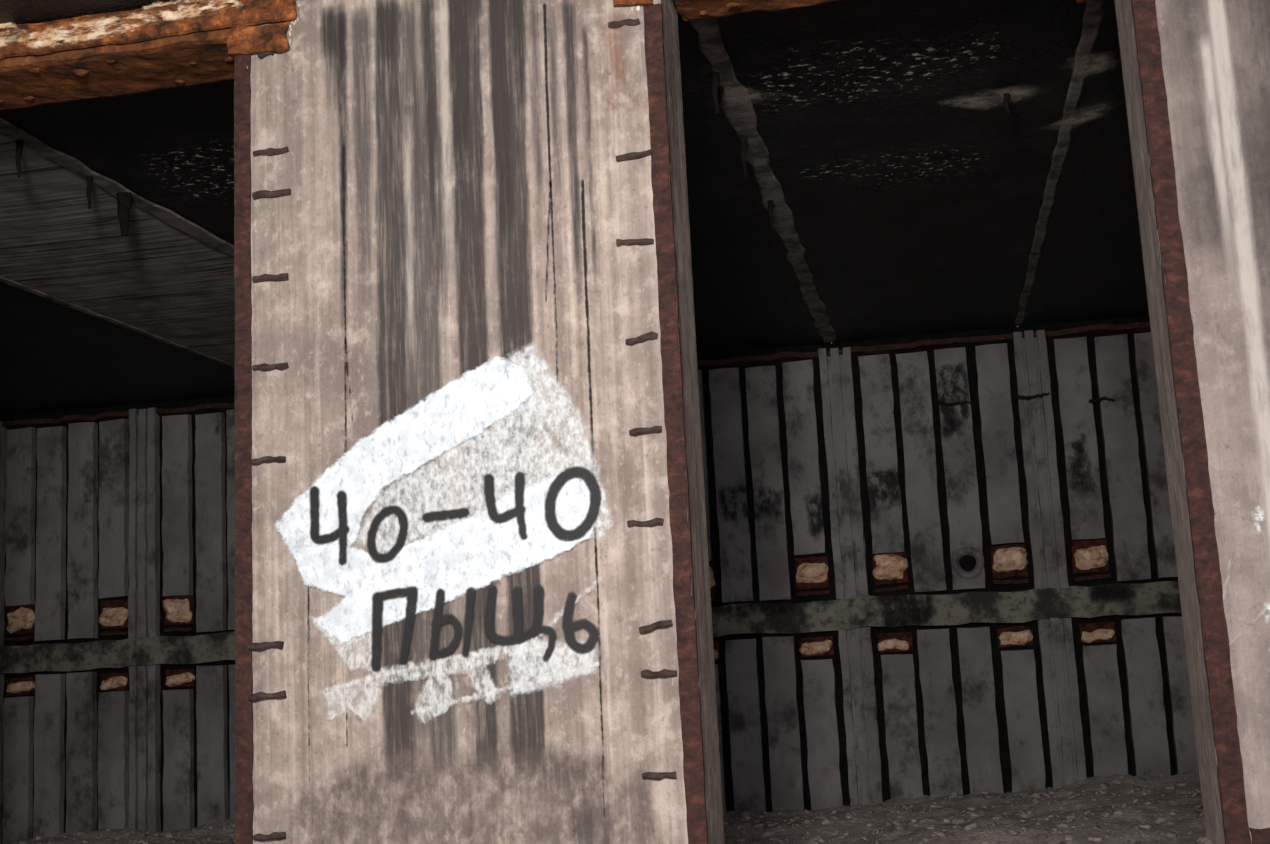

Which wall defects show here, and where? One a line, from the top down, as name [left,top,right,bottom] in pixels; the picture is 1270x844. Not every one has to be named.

leakage [322,0,590,519]
leakage [381,455,444,554]
leakage [383,602,455,757]
leakage [471,563,544,758]